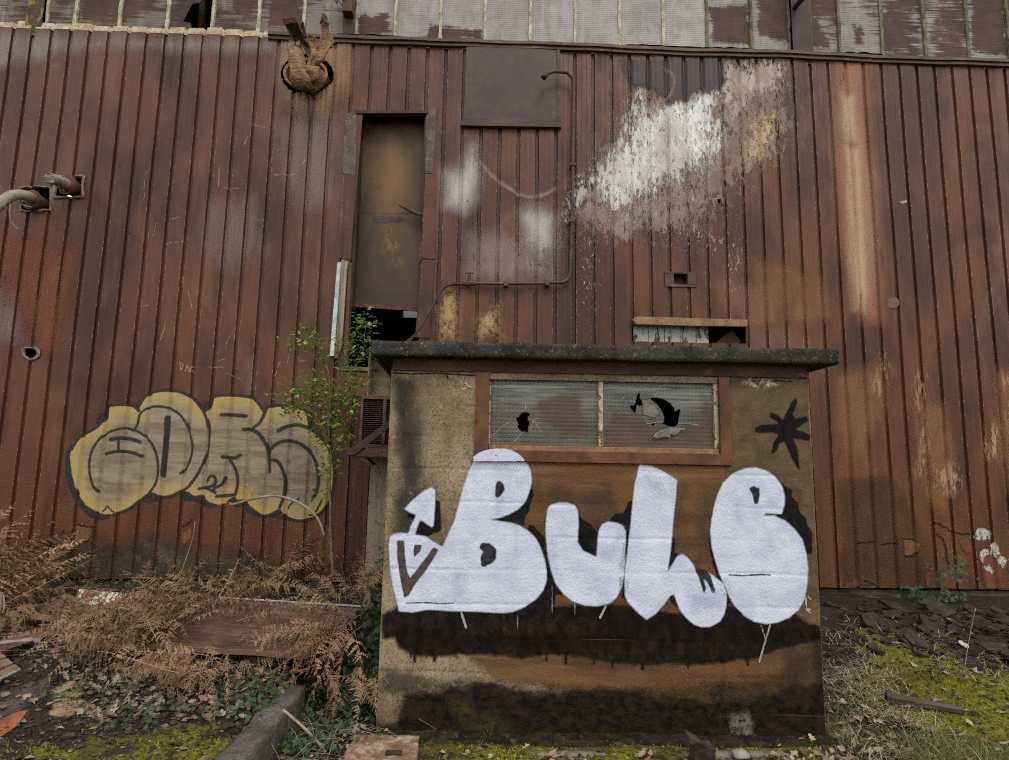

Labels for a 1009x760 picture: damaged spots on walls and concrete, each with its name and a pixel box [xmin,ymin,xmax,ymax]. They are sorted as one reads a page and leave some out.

peeling [567,58,786,296]
peeling [959,528,1007,588]